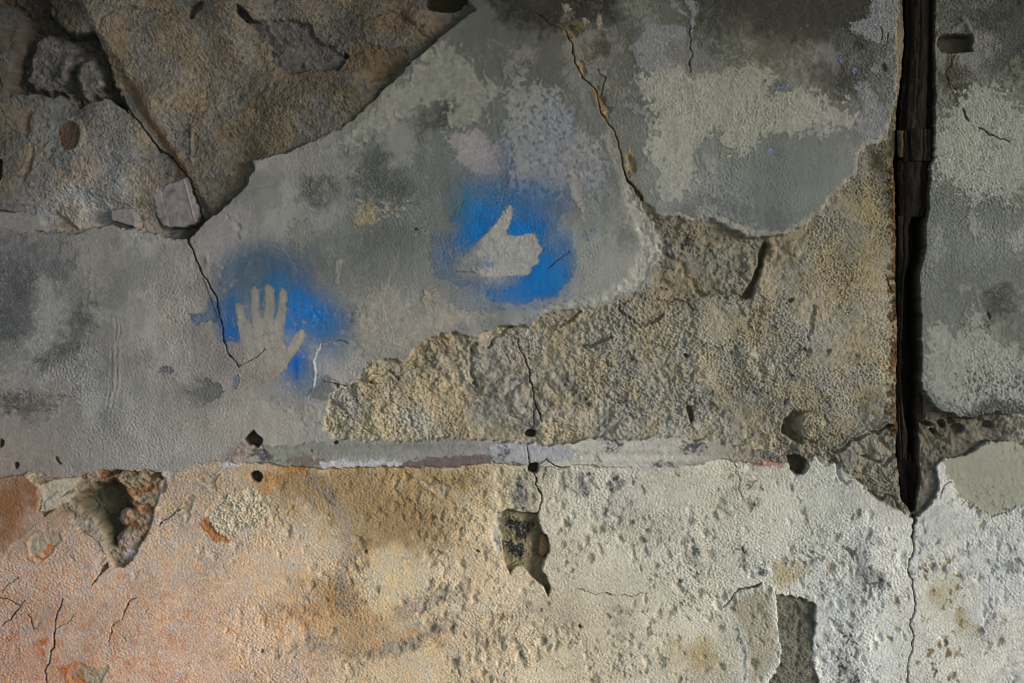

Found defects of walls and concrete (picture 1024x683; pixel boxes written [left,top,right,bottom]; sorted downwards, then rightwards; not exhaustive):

crack [539,16,644,202]
crack [122,96,265,367]
spalling [0,0,1024,518]
crack [506,338,567,514]
crack [0,577,75,683]
spalling [27,469,164,573]
crack [108,598,136,646]
spalling [497,509,551,596]
spalling [769,591,819,683]
crack [906,514,918,683]